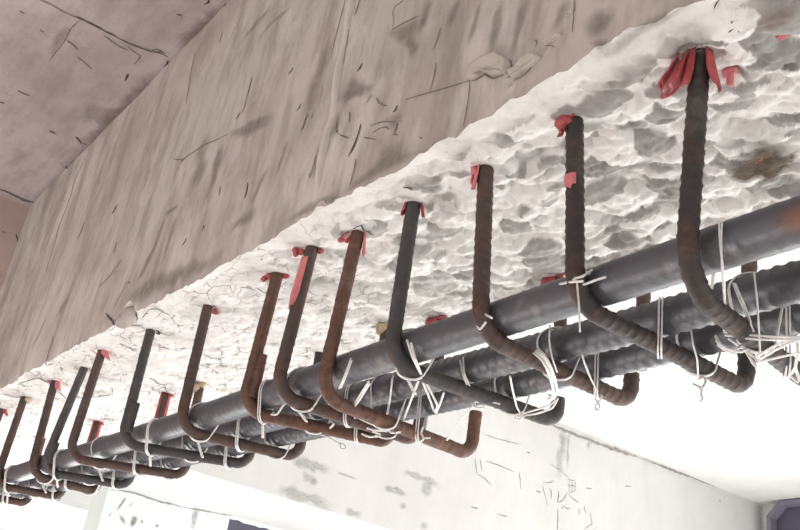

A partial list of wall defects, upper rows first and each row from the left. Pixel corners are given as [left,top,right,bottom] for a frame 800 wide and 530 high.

crack [40,0,168,69]
crack [336,28,532,184]
rust [731,149,795,181]
crack [99,262,133,351]
spalling [404,46,774,458]
spalling [720,195,800,339]
crack [4,338,78,399]
spalling [0,201,486,506]
spalling [760,346,800,386]